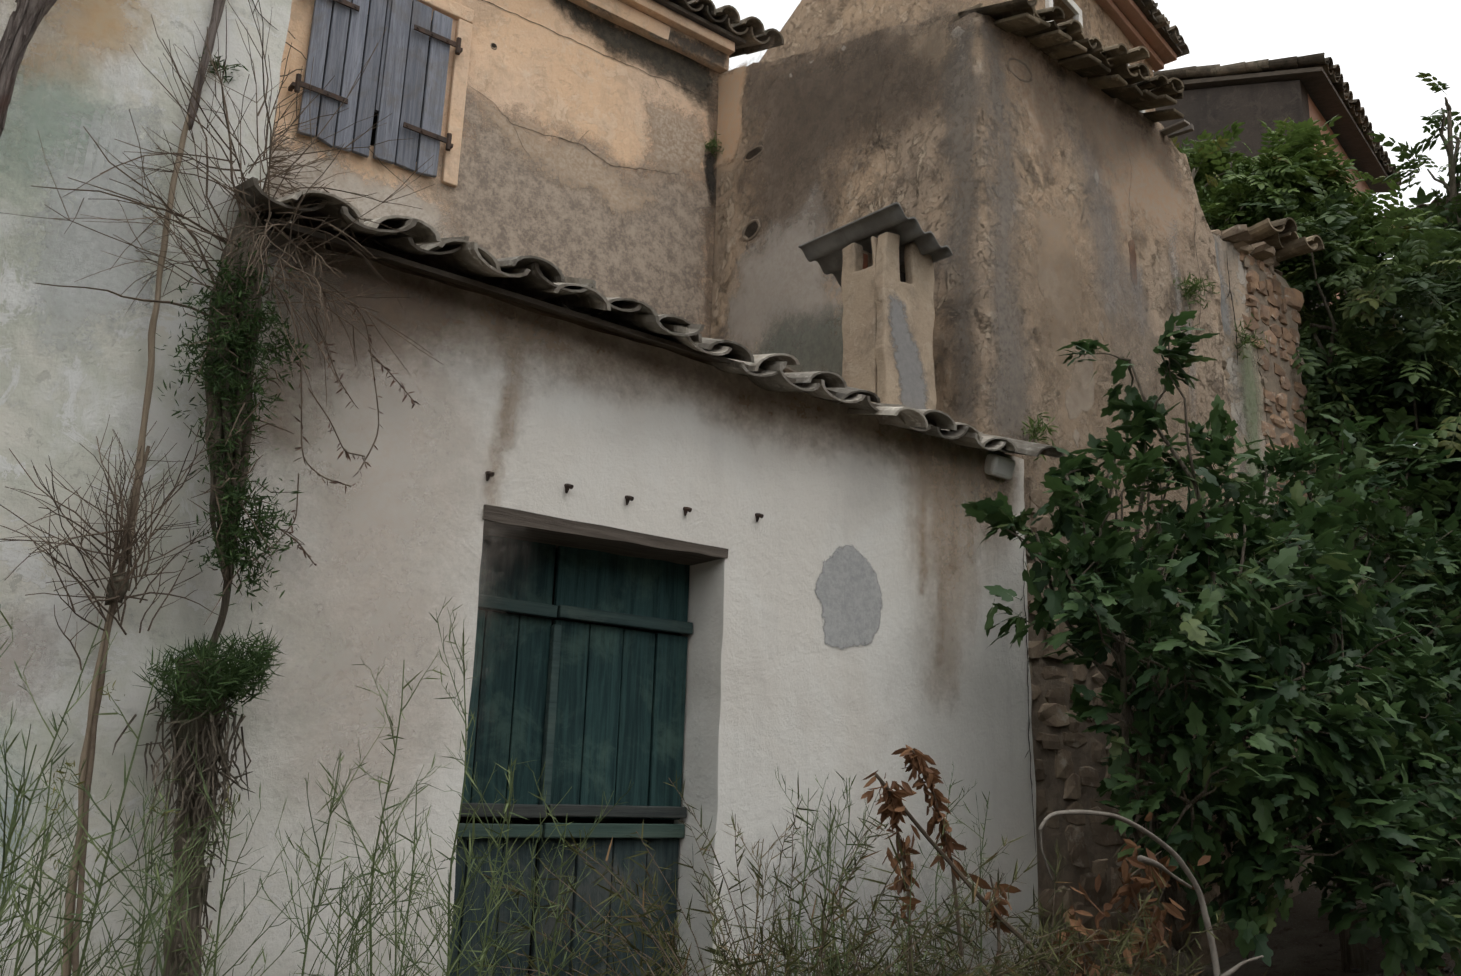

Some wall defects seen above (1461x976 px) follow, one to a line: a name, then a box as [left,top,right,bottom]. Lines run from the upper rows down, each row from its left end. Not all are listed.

damp [253,243,852,434]
peeling [480,99,656,214]
crack [468,85,681,175]
peeling [644,102,709,185]
damp [437,0,1067,494]
damp [1037,106,1195,421]